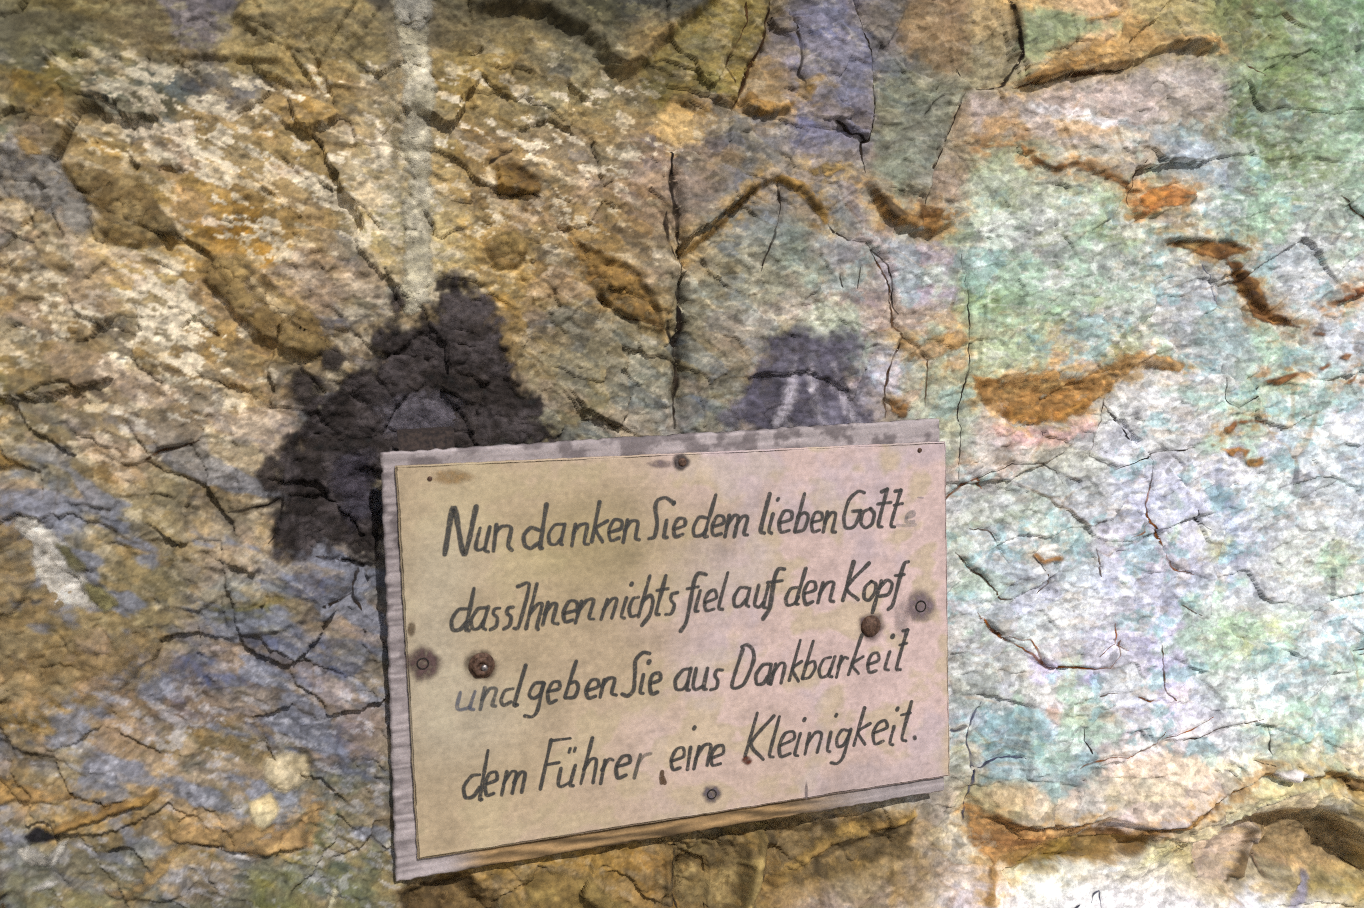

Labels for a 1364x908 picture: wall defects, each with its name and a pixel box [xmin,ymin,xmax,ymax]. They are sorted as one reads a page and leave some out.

crack [925,1,1124,204]
crack [596,152,683,429]
water stain [716,326,873,429]
crack [828,224,928,410]
crack [946,258,1063,499]
crack [1089,401,1203,616]
crack [955,528,1275,767]